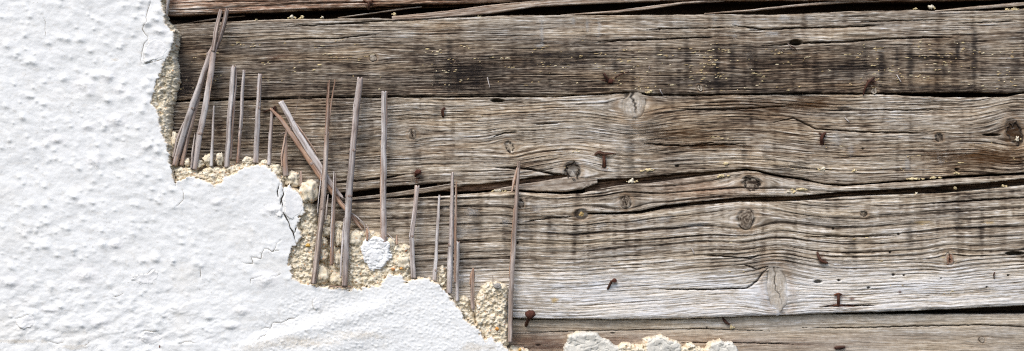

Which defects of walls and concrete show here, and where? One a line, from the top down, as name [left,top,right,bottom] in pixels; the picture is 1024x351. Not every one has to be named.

spalling [143,0,413,310]
crack [245,183,297,283]
spalling [437,265,529,351]